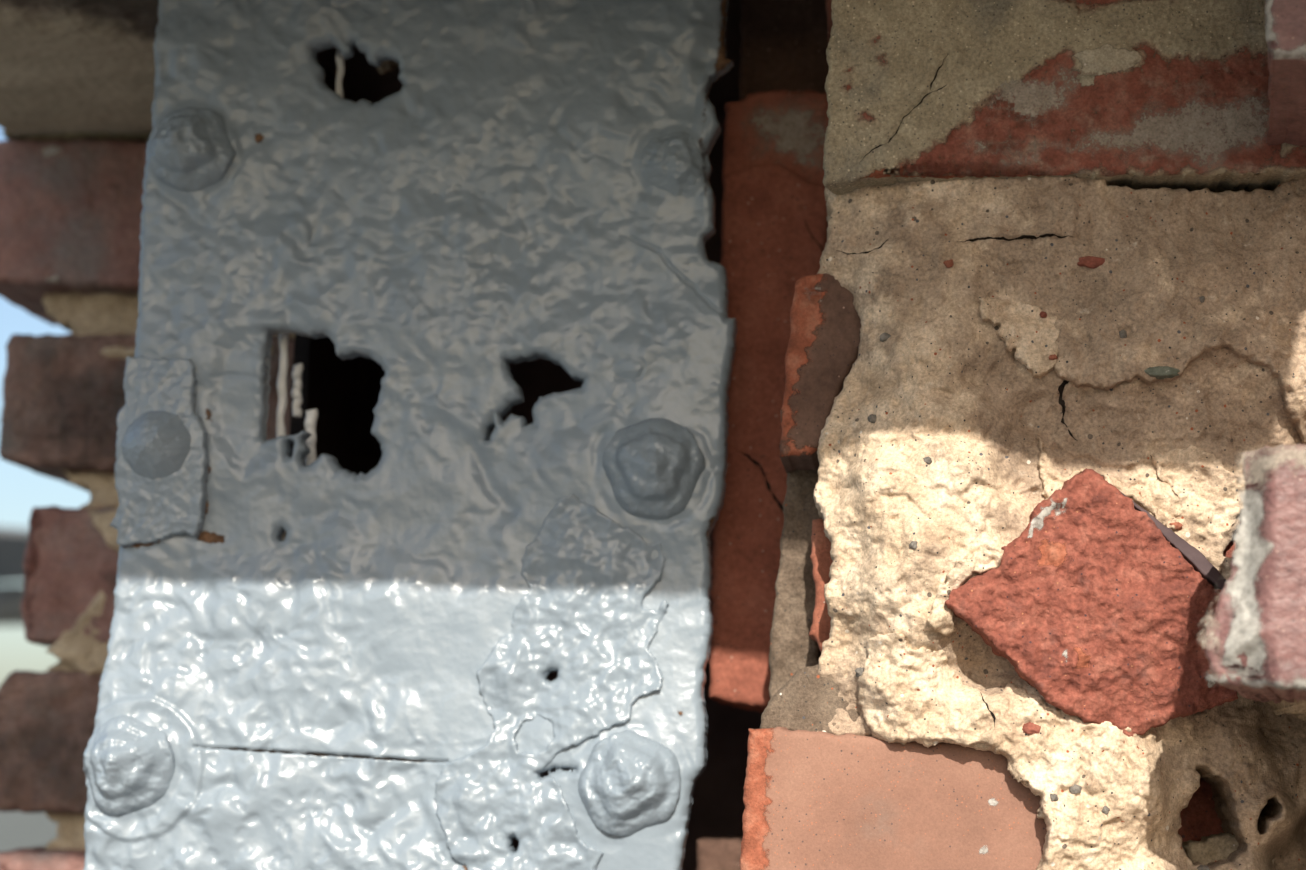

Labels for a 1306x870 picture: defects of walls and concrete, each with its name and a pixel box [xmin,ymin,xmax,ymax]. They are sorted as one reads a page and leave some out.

crack [859,56,947,163]
spalling [862,43,1306,179]
crack [961,233,1073,242]
crack [1058,380,1078,441]
crack [735,451,783,511]